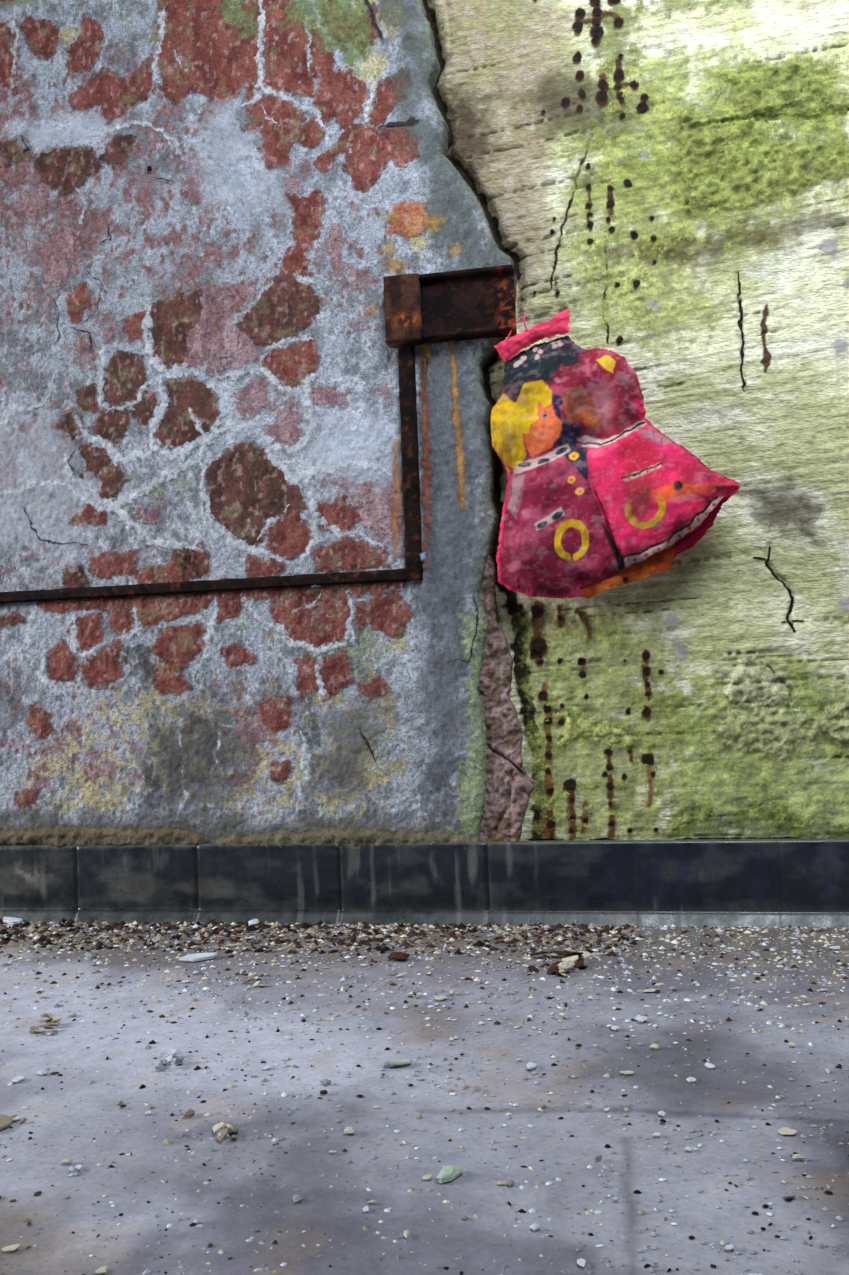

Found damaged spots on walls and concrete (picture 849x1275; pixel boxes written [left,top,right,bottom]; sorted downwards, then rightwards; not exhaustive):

peeling [0,0,420,796]
peeling [385,199,436,240]
crack [378,0,590,289]
water stain [536,0,849,355]
crack [737,272,771,392]
spalling [0,555,536,851]
crack [449,352,615,841]
corrosion [530,600,592,666]
corrosion [538,683,589,840]
corrosion [602,743,655,838]
water stain [516,605,849,840]
crack [753,545,804,632]